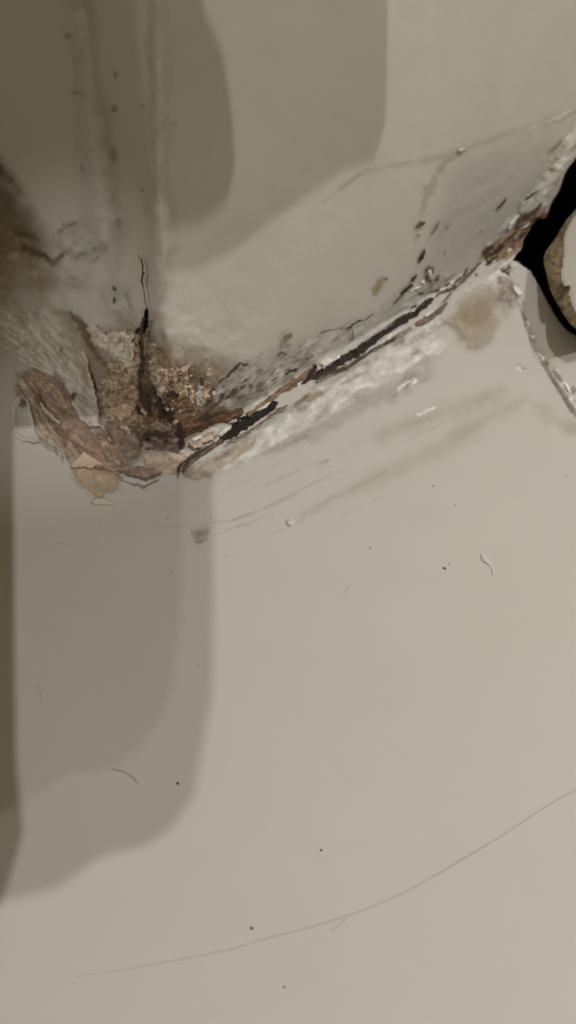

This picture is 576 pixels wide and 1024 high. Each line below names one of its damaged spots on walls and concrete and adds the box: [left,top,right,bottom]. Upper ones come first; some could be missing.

damp [0,185,63,293]
crack [134,258,167,419]
peeling [0,157,576,506]